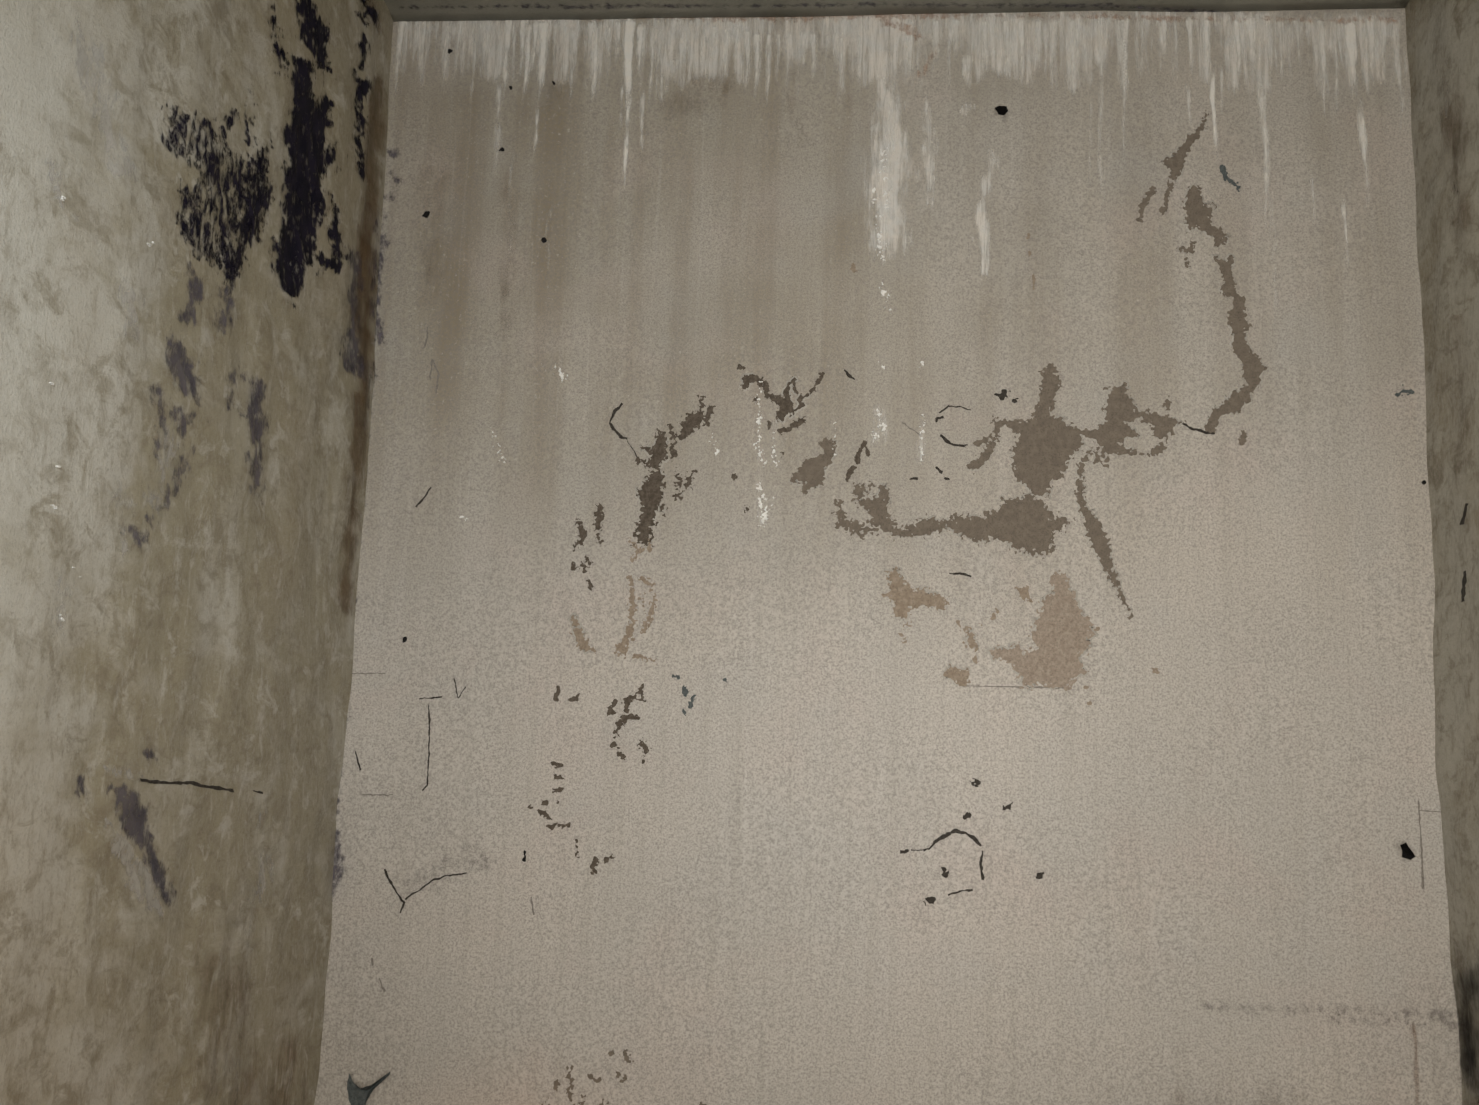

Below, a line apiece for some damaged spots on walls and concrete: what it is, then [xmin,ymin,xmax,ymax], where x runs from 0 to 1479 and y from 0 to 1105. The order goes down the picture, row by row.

damp [396,2,1401,311]
damp [119,0,400,552]
damp [753,381,780,467]
peeling [737,364,825,458]
peeling [788,110,1269,705]
peeling [567,395,716,665]
damp [756,482,775,527]
damp [332,798,343,894]
damp [1459,971,1479,1084]